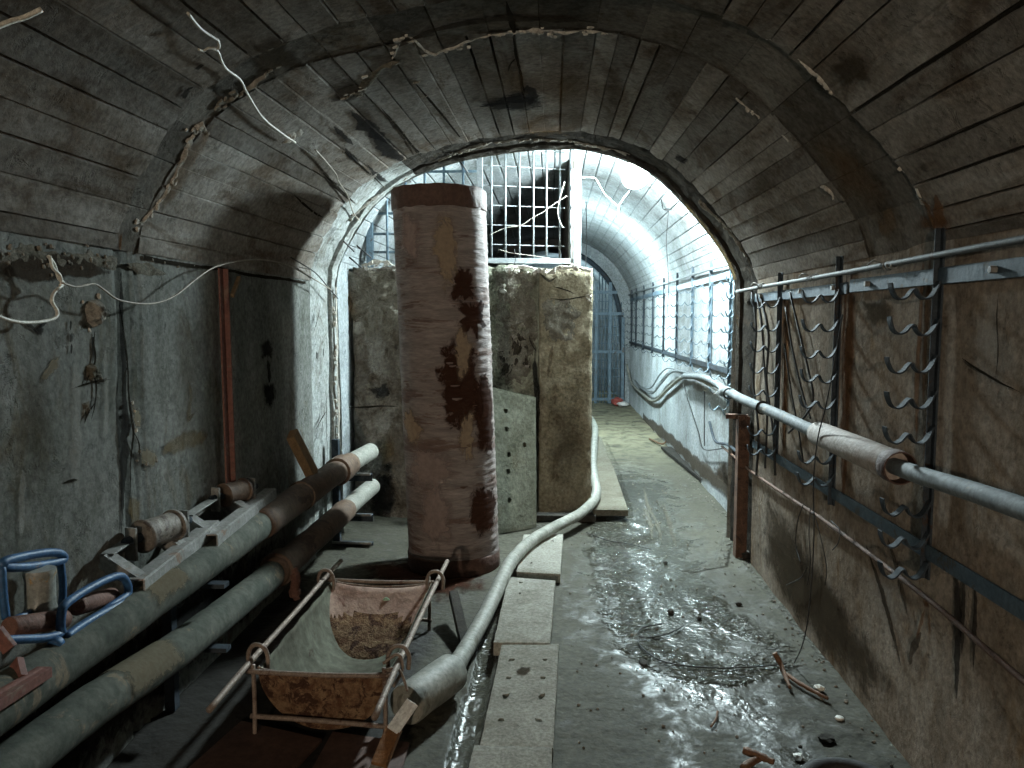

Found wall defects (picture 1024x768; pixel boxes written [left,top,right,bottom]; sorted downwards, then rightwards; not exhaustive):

crack [506,1,525,94]
water stain [480,85,541,111]
spalling [0,243,117,276]
corrosion [435,267,494,458]